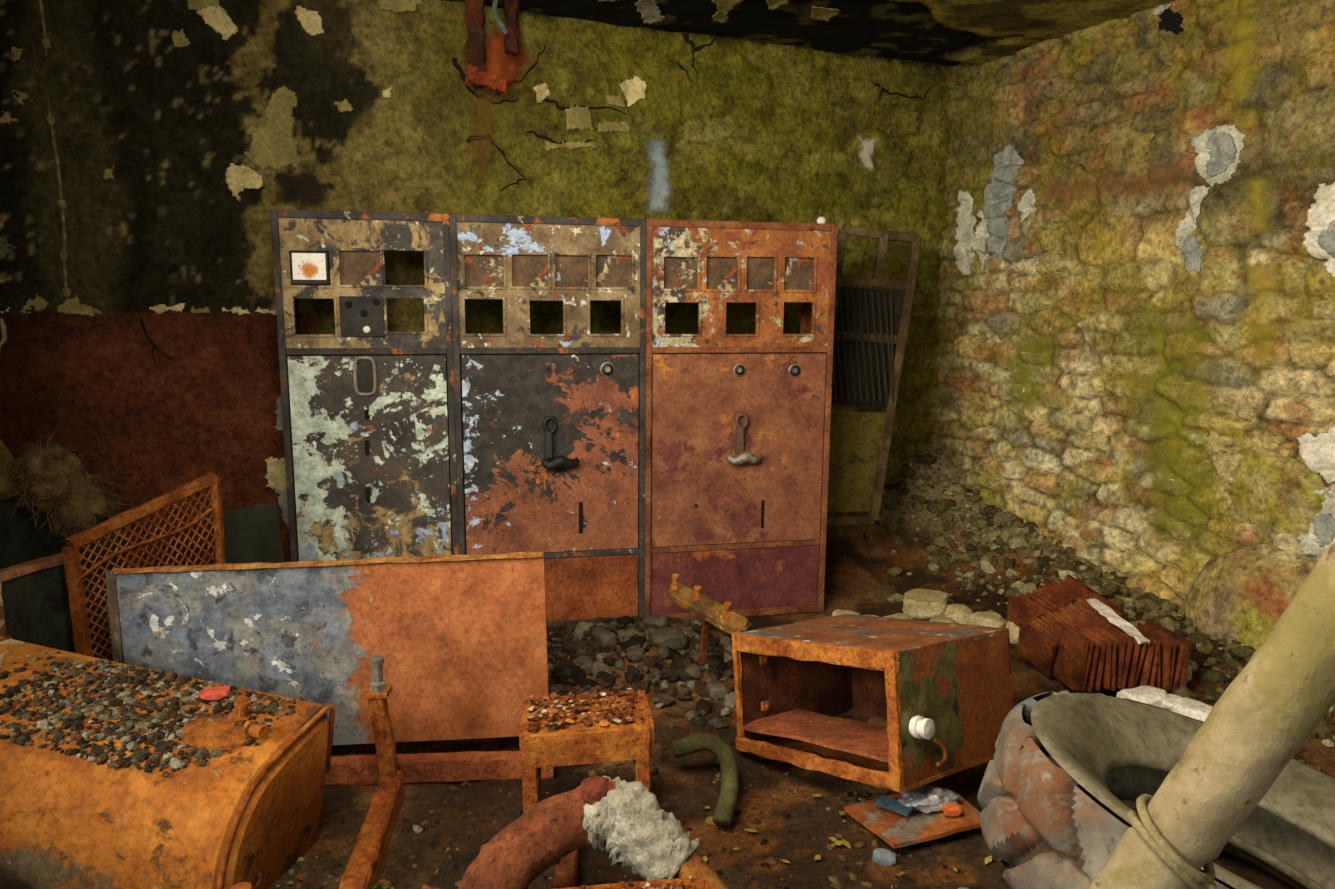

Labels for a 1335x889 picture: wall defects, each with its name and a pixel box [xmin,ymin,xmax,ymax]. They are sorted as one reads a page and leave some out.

peeling [187,0,238,41]
flaking render [294,6,324,36]
peeling [598,0,665,25]
hole [1152,4,1184,35]
corrosion [474,28,528,167]
flaking render [544,76,647,151]
peeling [225,86,301,201]
leakage [857,136,875,169]
leakage [274,166,333,208]
efflorescence [648,141,670,211]
peeling [982,144,1037,260]
peeling [149,303,276,315]